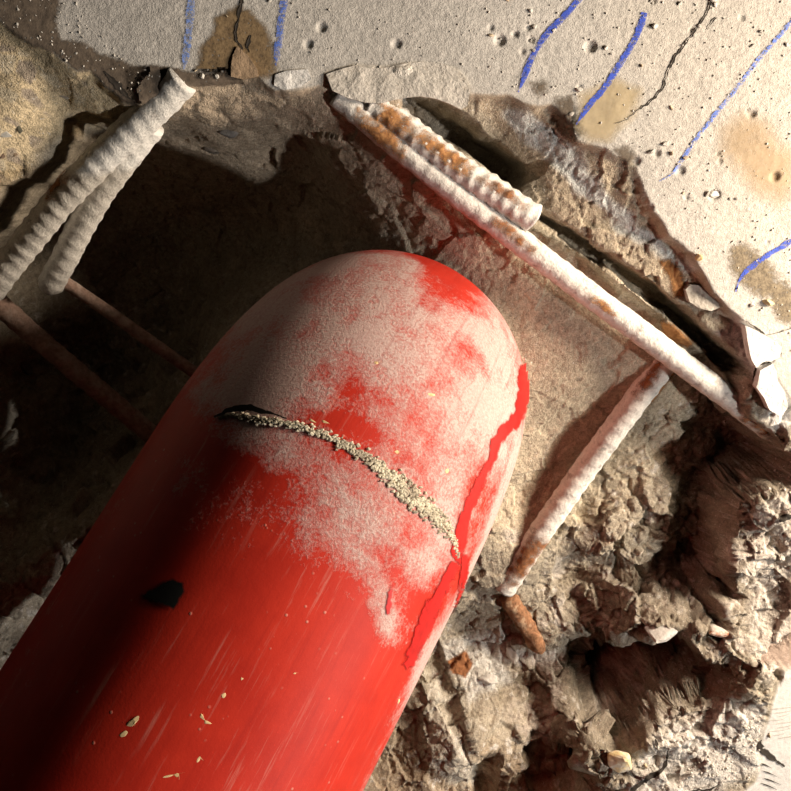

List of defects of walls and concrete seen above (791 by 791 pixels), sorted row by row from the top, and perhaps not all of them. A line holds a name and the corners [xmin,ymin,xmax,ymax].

leakage [0,0,278,106]
corrosion [581,83,636,137]
crack [617,1,717,123]
spalling [0,20,198,670]
spalling [329,94,773,439]
corrosion [661,258,686,298]
corrosion [660,322,693,349]
leakage [728,243,791,323]
peeling [752,363,788,417]
spalling [496,359,674,597]
spalling [736,488,791,702]
spalling [608,699,774,791]